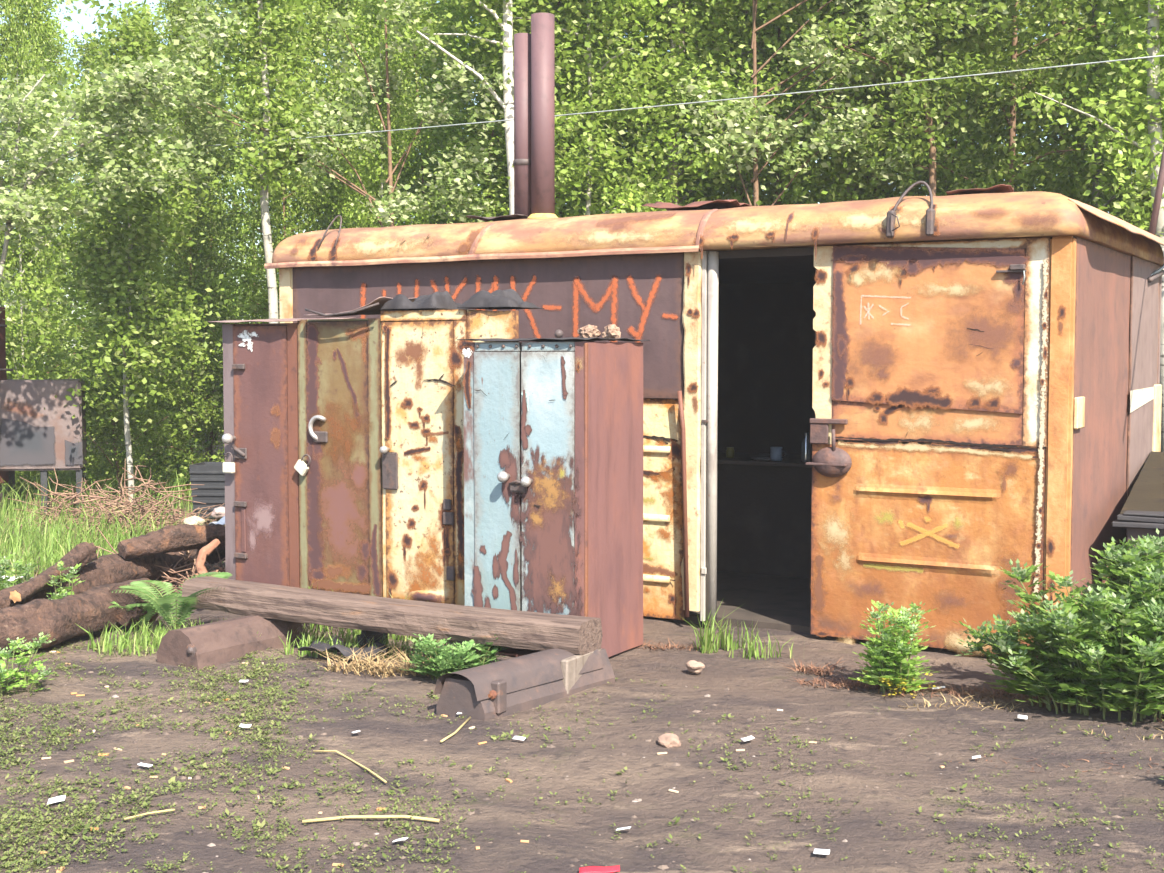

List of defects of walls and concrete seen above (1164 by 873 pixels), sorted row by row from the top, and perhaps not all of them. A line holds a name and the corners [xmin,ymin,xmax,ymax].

corrosion [291,238,340,261]
corrosion [459,229,481,254]
corrosion [765,211,794,242]
corrosion [812,204,1029,425]
corrosion [449,337,473,408]
corrosion [306,323,464,598]
peeling [471,390,584,616]
corrosion [643,439,681,540]
corrosion [918,495,933,512]
peeling [838,259,1049,593]
corrosion [643,563,677,577]
corrosion [812,554,827,614]